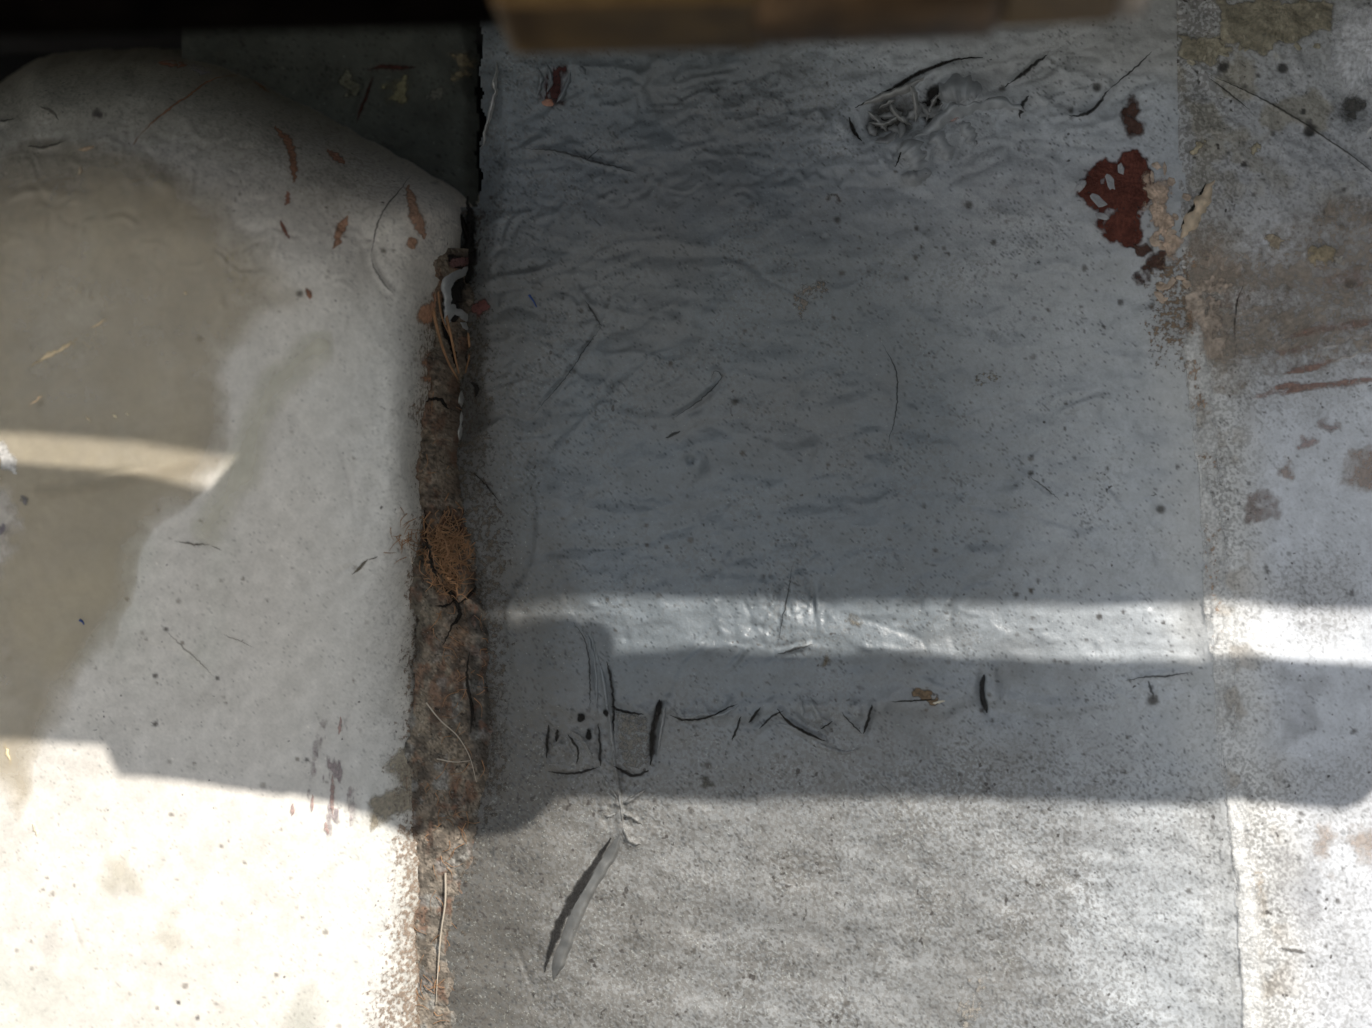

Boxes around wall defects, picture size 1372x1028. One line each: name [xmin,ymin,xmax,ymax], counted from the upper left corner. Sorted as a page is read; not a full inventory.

corrosion [1120,96,1144,138]
crack [425,196,479,409]
water stain [0,167,247,785]
crack [424,510,476,733]
spalling [980,675,988,713]